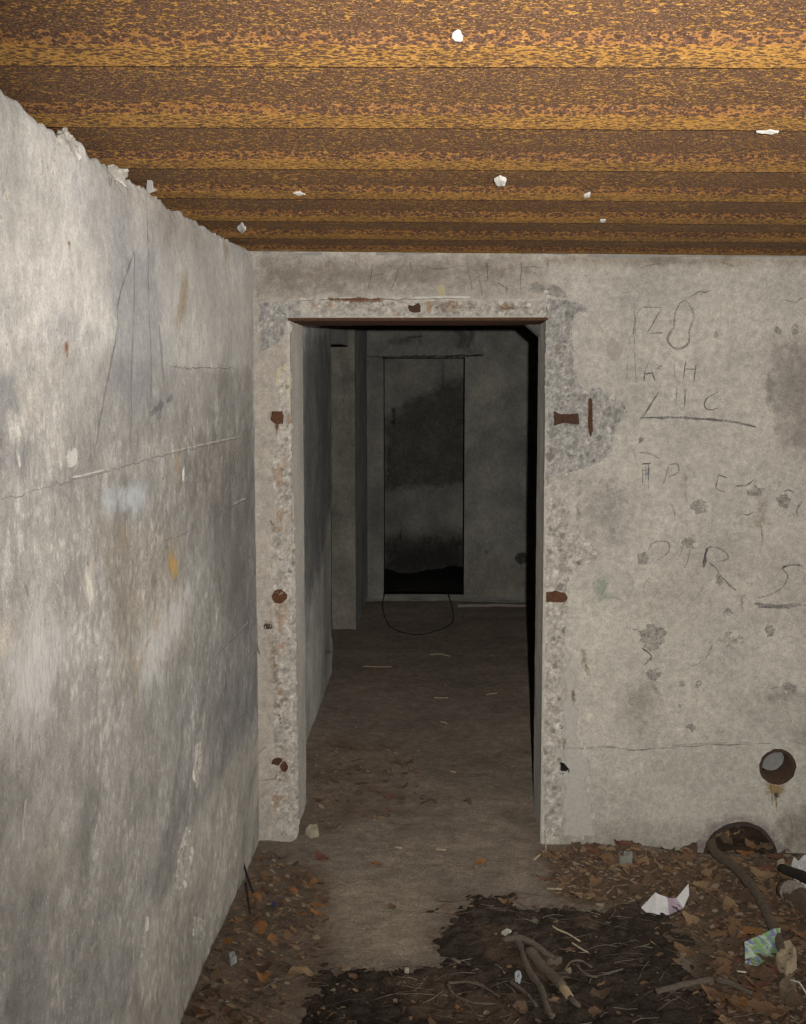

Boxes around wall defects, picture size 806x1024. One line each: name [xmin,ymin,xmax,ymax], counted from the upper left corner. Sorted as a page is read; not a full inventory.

spalling [256,282,628,841]